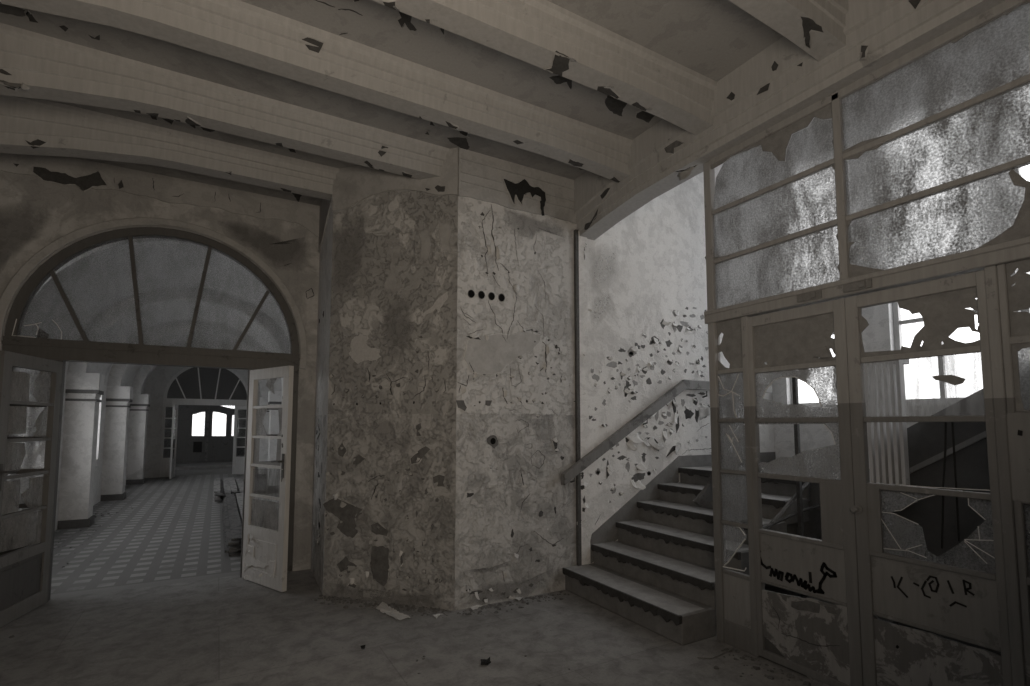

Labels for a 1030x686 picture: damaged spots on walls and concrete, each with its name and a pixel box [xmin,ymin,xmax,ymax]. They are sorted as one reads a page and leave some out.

peeling [800,16,824,49]
peeling [544,51,577,89]
peeling [757,61,778,95]
peeling [597,86,655,123]
peeling [32,166,124,192]
peeling [503,178,546,216]
spalling [468,290,505,302]
crack [464,205,560,509]
peeling [574,307,708,427]
peeling [368,423,450,502]
peeling [316,493,446,591]
peeling [376,602,410,620]